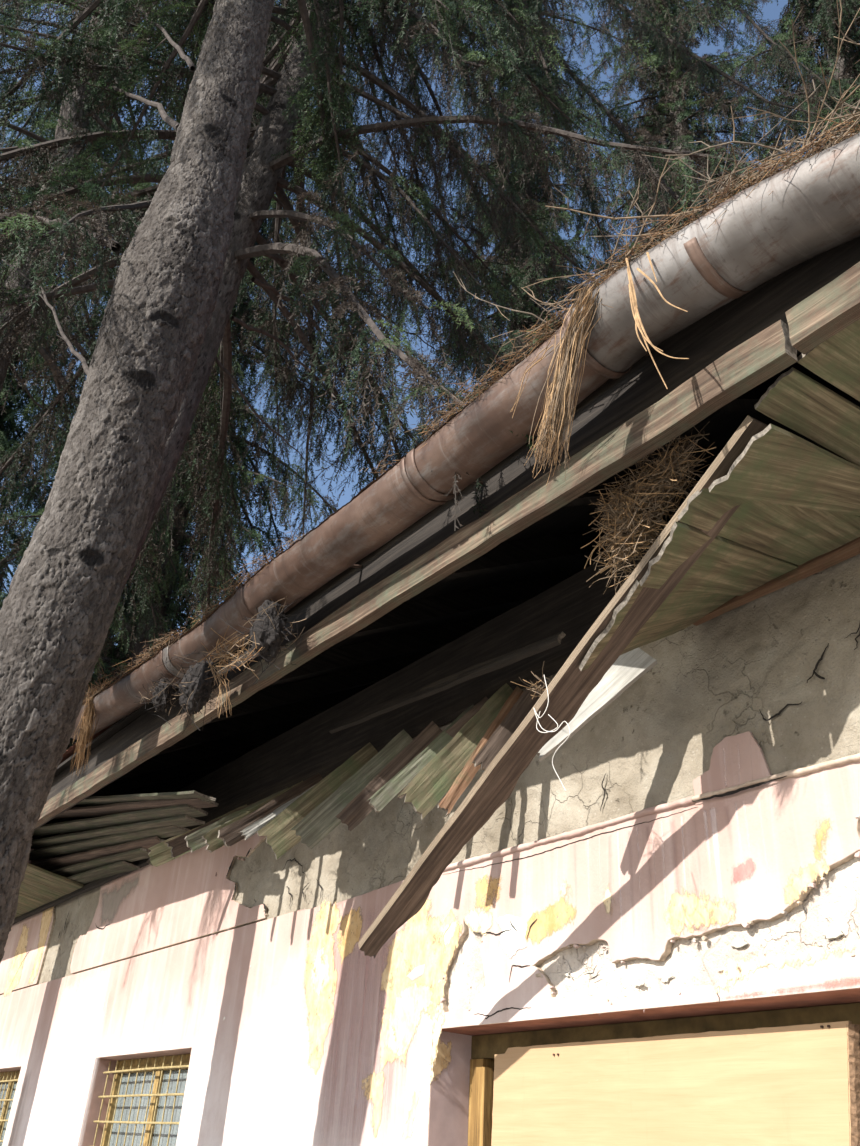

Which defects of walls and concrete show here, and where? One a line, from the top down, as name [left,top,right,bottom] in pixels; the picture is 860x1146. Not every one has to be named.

flaking render [450,554,860,864]
crack [759,623,860,721]
flaking render [4,887,101,996]
flaking render [215,767,485,1075]
crack [482,919,537,937]
peeling [525,897,576,943]
flaking render [535,820,860,1004]
peeling [361,875,500,1139]
crack [477,1007,531,1019]